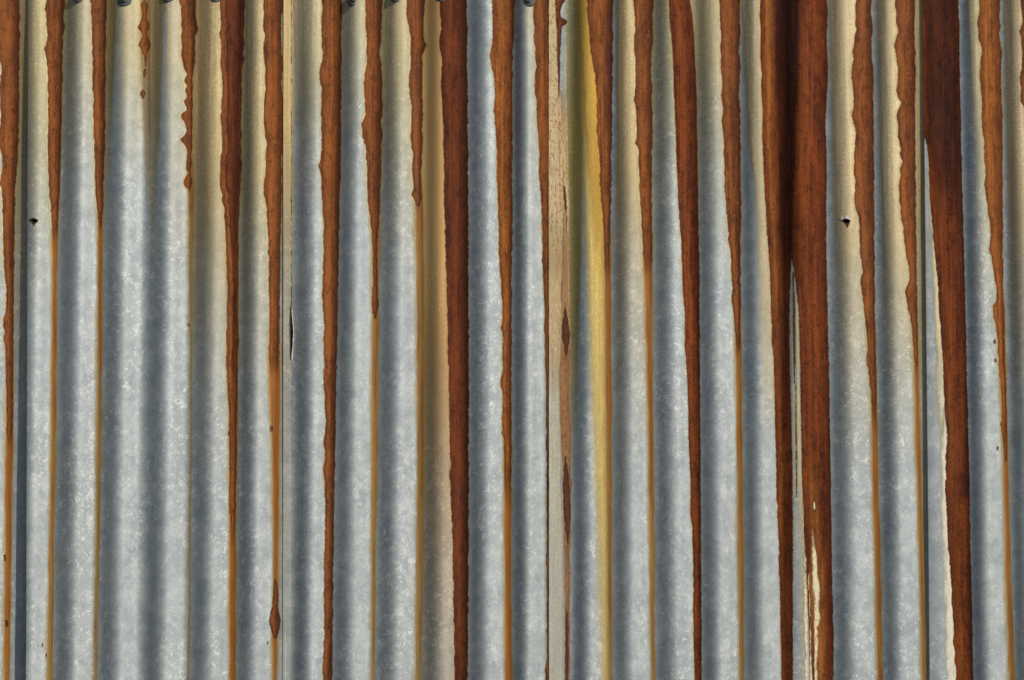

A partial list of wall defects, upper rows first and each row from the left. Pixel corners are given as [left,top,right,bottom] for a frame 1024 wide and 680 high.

rust [0,0,21,680]
rust [218,0,245,680]
rust [261,0,284,680]
rust [319,0,342,680]
rust [361,0,384,680]
rust [405,0,470,680]
rust [490,0,515,680]
rust [668,0,702,680]
rust [760,0,834,680]
rust [846,0,883,680]
rust [893,0,974,680]
rust [976,0,1015,680]